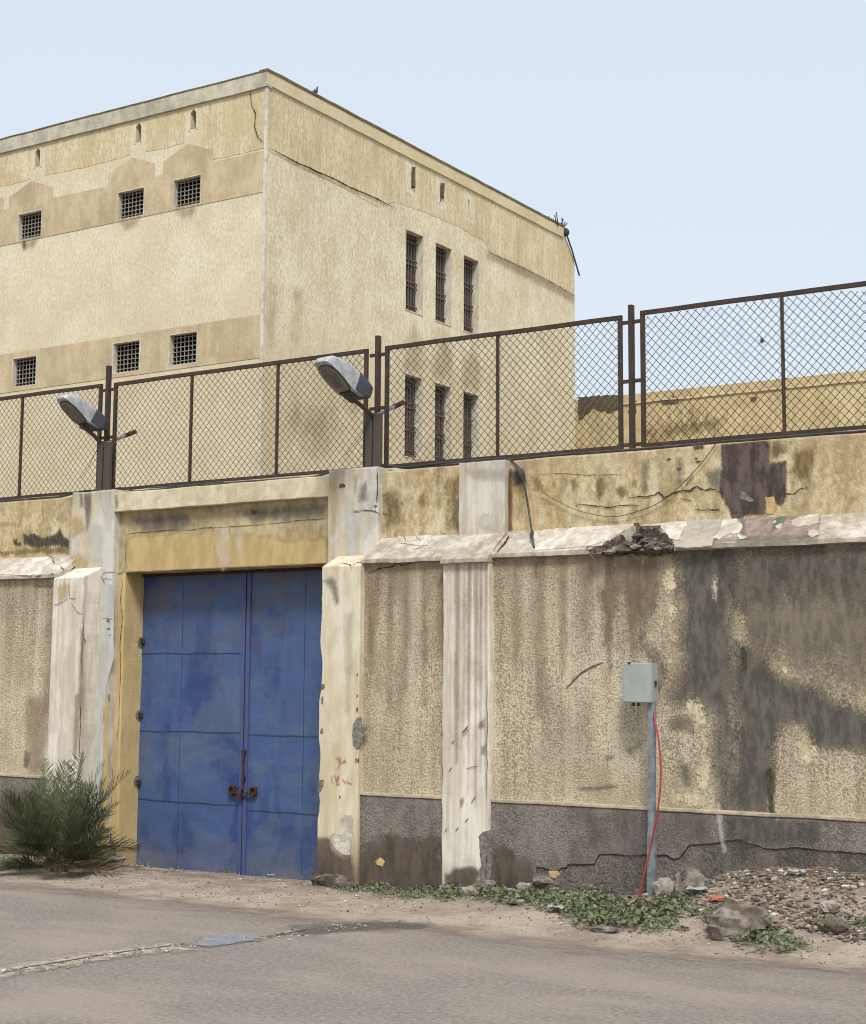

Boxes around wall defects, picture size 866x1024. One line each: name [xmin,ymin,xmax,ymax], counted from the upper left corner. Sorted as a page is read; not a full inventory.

crack [250,91,396,209]
leakage [0,494,101,566]
peeling [532,521,687,557]
crack [579,486,721,511]
peeling [713,518,747,540]
peeling [740,491,819,537]
crack [39,518,324,750]
leakage [596,441,866,846]
flaking render [352,694,368,763]
peeling [330,815,353,855]
crack [546,840,817,871]